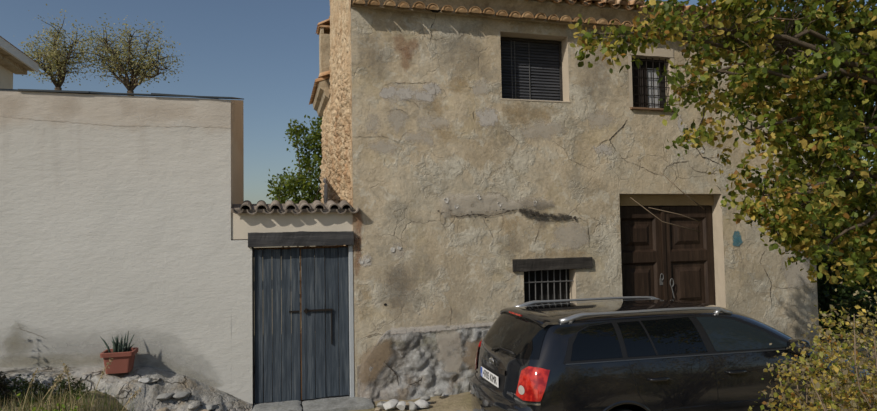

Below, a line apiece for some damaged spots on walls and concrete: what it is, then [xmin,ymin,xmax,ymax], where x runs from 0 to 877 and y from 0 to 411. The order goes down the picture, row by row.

crack [601,122,720,176]
crack [435,132,520,228]
spalling [359,341,391,386]
spalling [437,331,483,372]